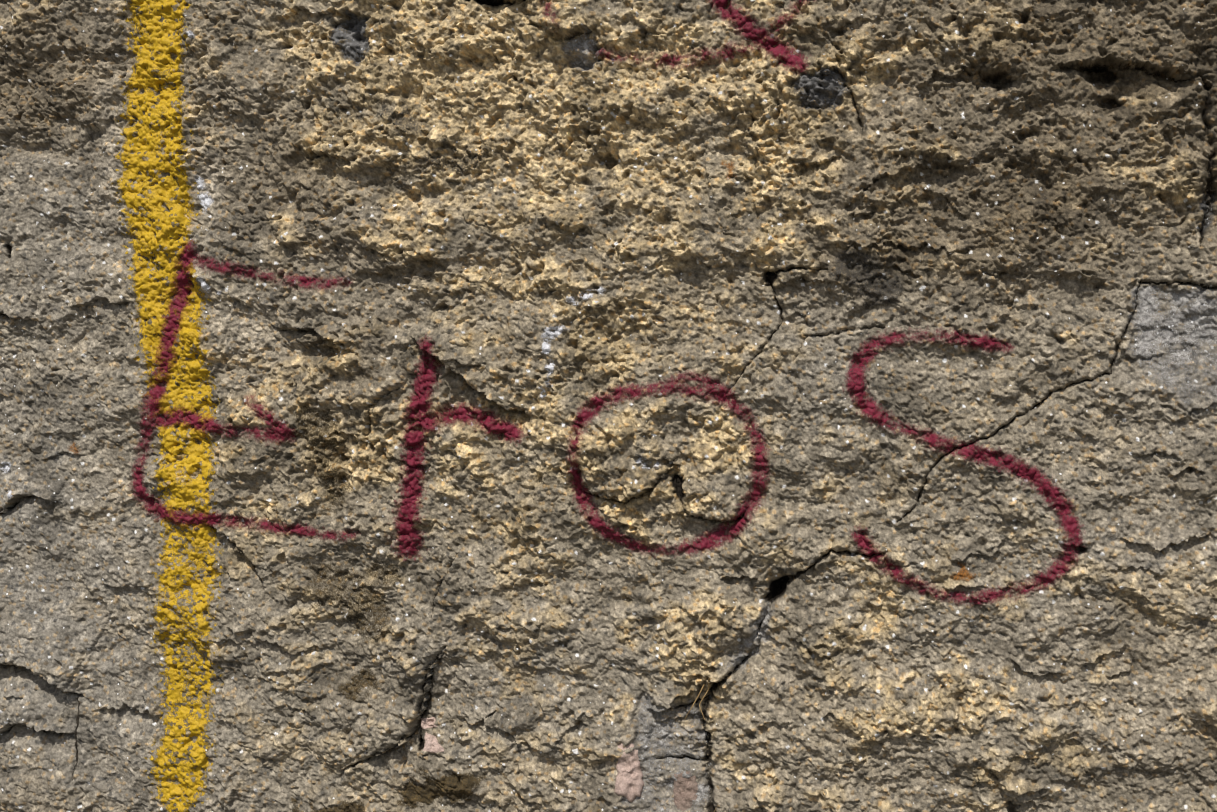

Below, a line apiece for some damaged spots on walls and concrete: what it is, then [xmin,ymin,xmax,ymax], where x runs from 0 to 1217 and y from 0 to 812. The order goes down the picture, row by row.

crack [1065,63,1215,244]
crack [733,267,884,386]
crack [900,281,1217,520]
crack [581,489,650,504]
crack [3,694,81,781]
crack [345,652,442,769]
crack [656,550,881,812]